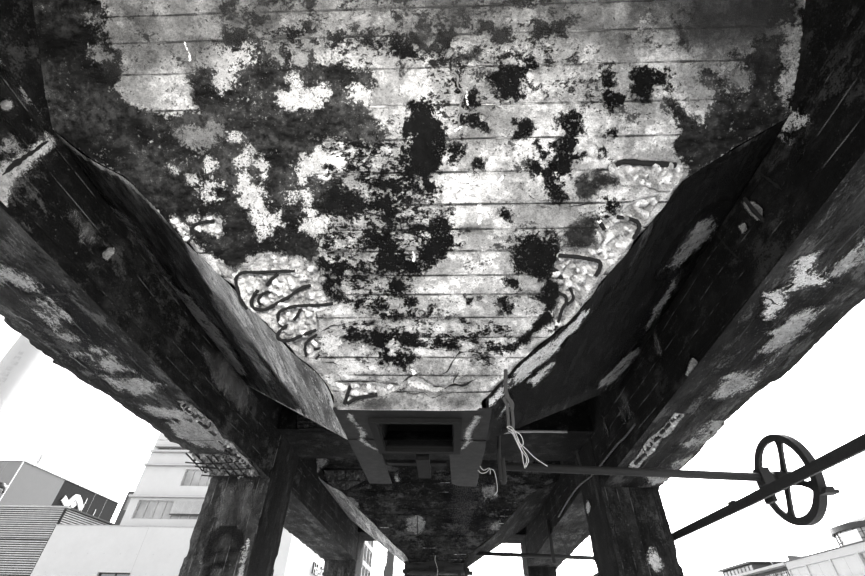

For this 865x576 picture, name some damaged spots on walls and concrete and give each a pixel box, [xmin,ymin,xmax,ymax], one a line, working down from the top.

damp [0,133,55,207]
damp [69,209,96,243]
damp [822,238,865,278]
damp [0,264,230,452]
damp [201,346,251,415]
damp [209,293,270,384]
damp [710,306,826,402]
spalling [177,400,260,479]
spalling [629,413,684,468]